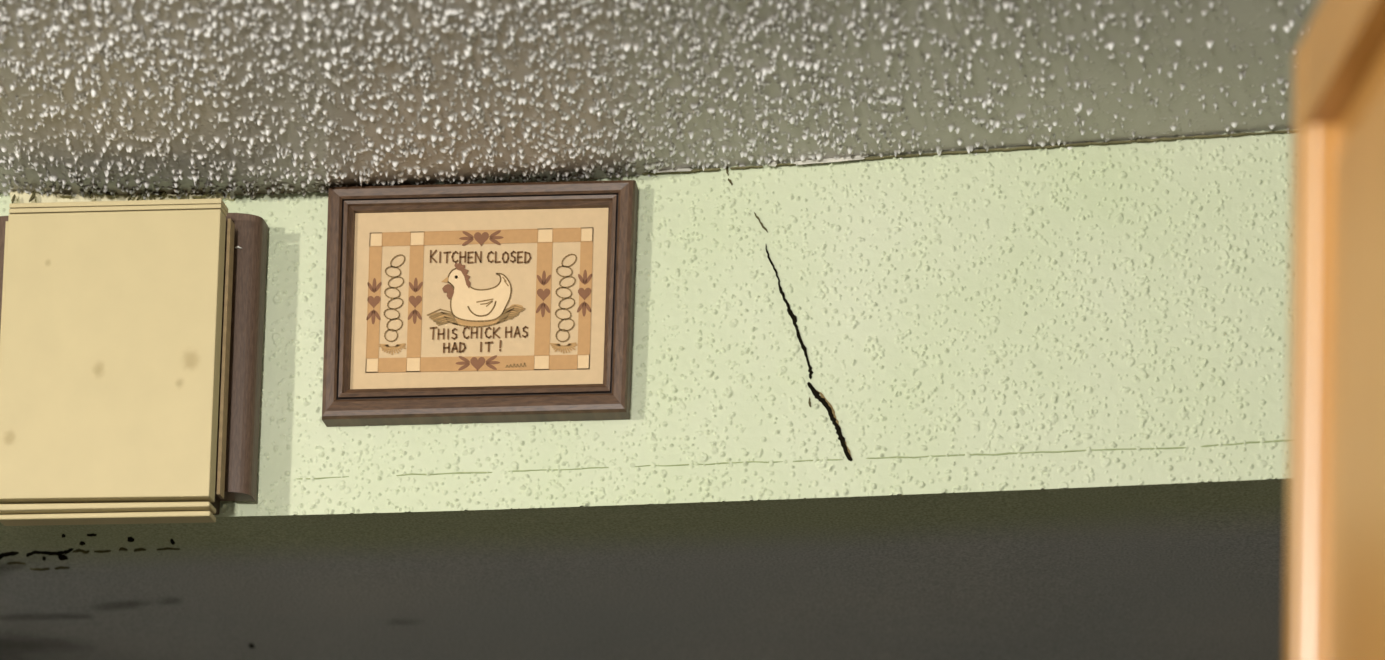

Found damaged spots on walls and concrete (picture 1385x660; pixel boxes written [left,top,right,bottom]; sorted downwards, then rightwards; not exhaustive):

crack [642,130,1293,185]
crack [396,212,1288,476]